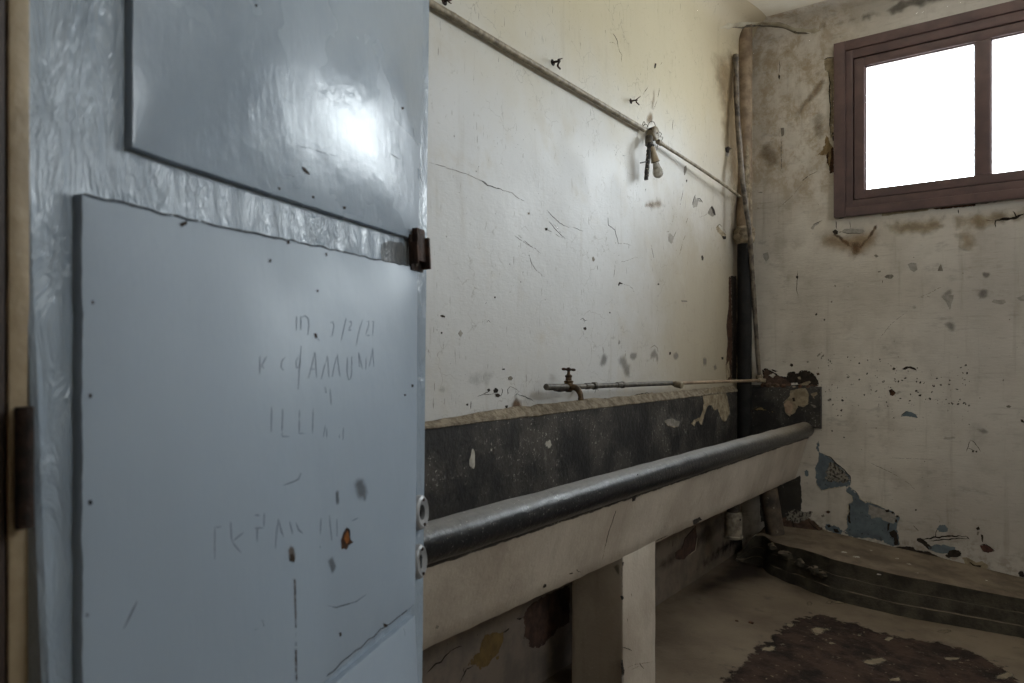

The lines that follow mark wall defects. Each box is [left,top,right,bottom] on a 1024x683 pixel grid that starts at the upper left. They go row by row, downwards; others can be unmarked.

spalling [818,57,834,174]
spalling [664,276,737,427]
peeling [762,354,994,581]
peeling [468,570,579,670]